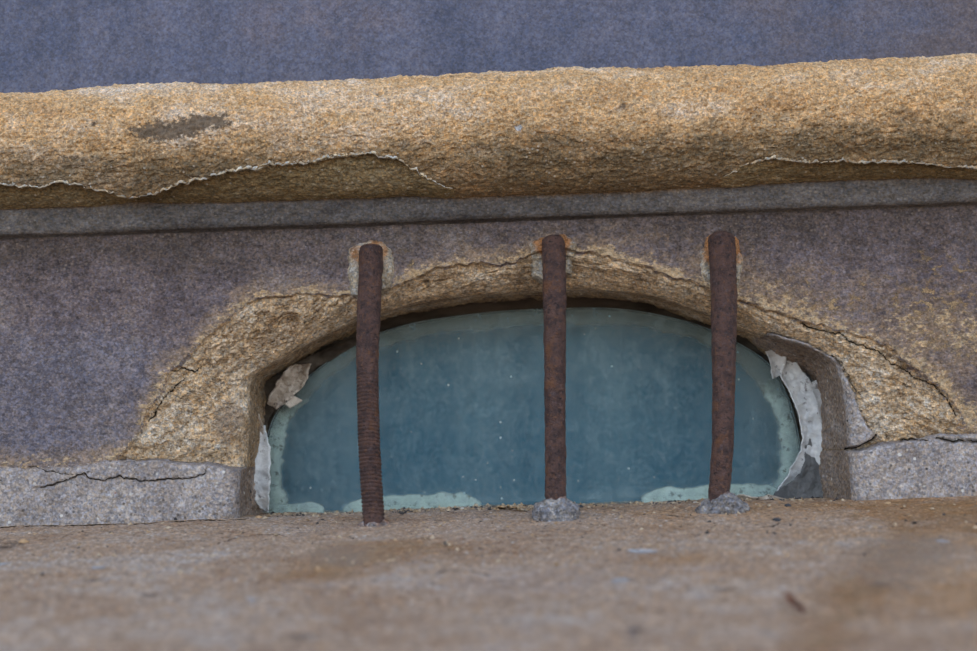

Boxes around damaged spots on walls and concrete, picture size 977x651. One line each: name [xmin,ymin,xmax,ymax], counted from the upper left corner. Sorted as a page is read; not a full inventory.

leakage [127,111,232,143]
spalling [380,253,543,320]
spalling [566,250,711,323]
spalling [115,291,357,512]
spalling [737,299,972,491]
crack [802,323,977,443]
crack [32,466,207,488]